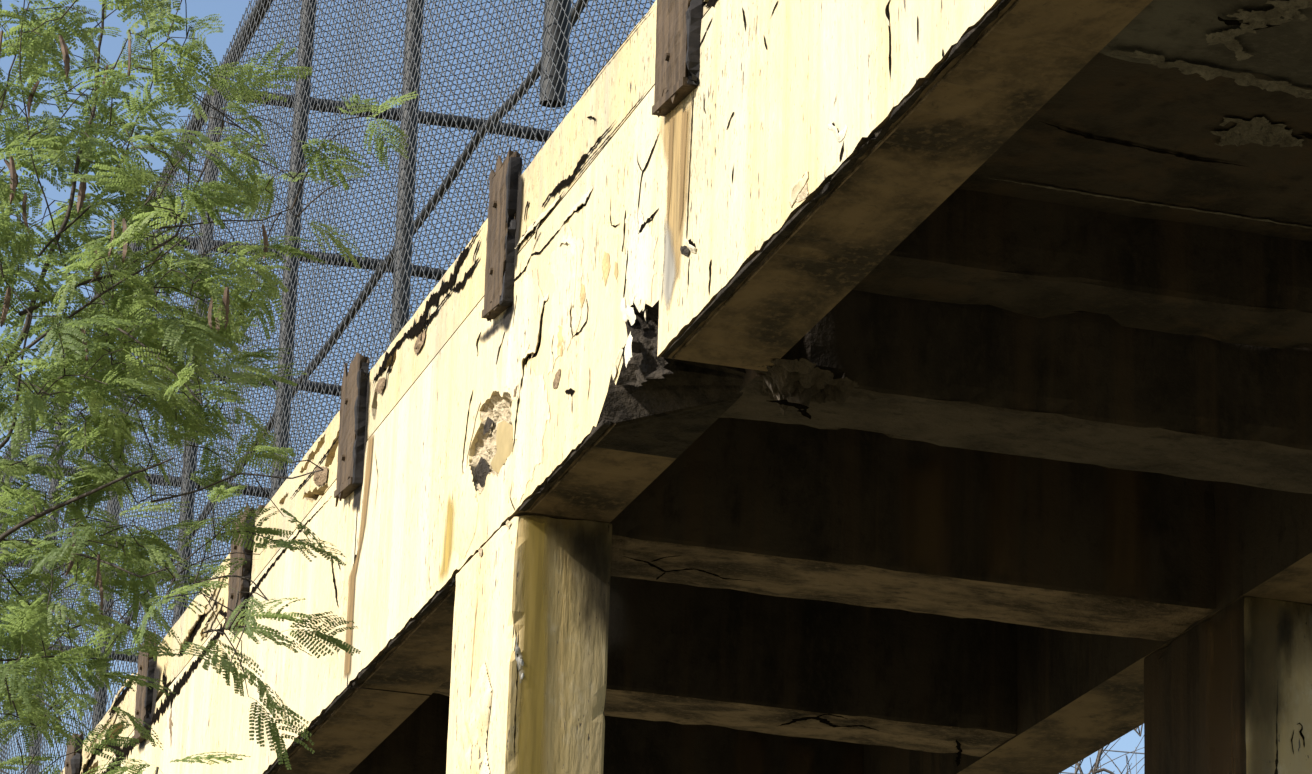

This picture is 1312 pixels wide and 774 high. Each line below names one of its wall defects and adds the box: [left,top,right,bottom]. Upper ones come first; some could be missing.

crack [513,6,654,322]
crack [595,89,734,300]
rust [659,107,689,279]
spalling [1109,0,1312,99]
peeling [1211,117,1304,147]
crack [371,225,482,391]
peeling [463,185,593,504]
peeling [602,207,679,387]
crack [79,436,339,774]
leakage [516,512,616,774]
crack [779,714,885,733]
crack [1274,685,1305,774]